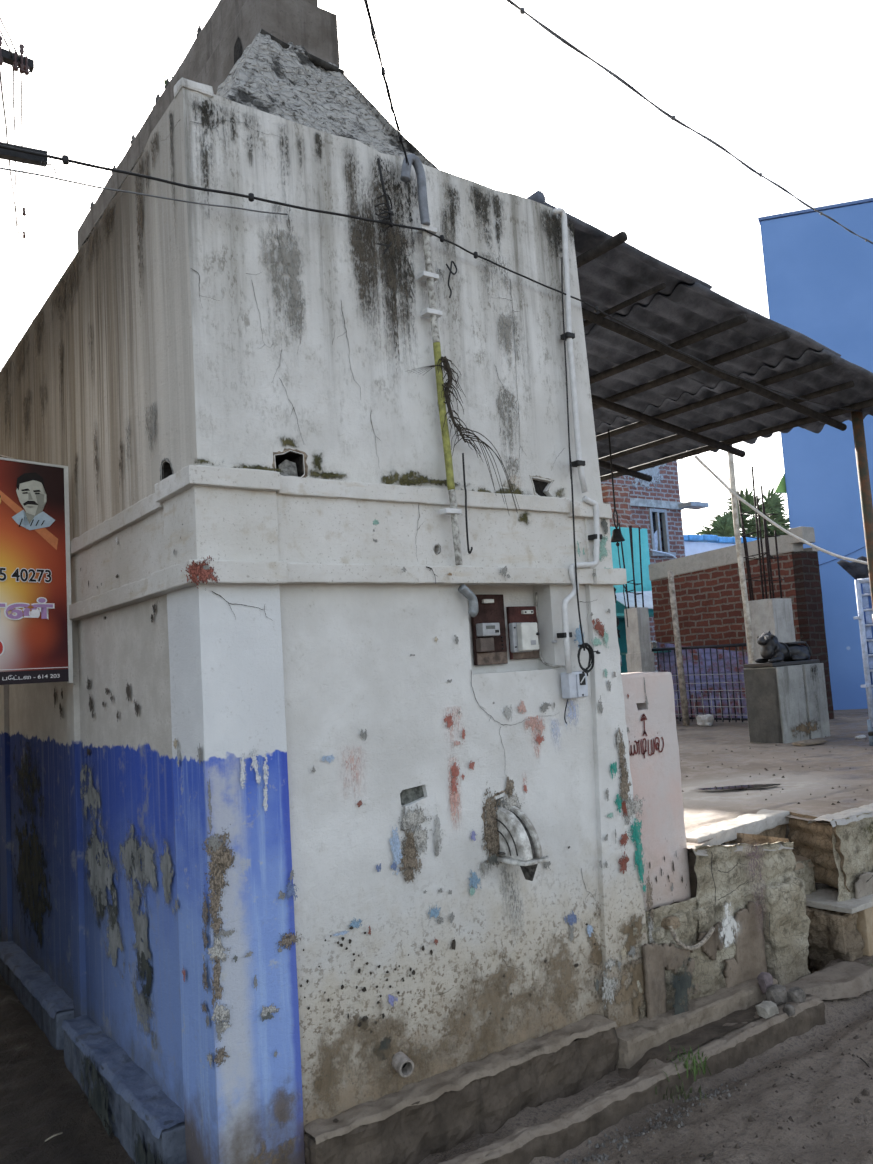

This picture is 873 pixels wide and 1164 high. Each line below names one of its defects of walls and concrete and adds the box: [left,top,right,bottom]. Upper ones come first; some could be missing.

leakage [135,114,175,284]
leakage [345,154,419,372]
leakage [1,207,114,439]
flaking render [181,556,220,591]
leakage [13,742,52,948]
flaking render [376,785,442,884]
peeling [449,761,475,803]
flaking render [471,776,527,870]
flaking render [197,743,253,1069]
flaking render [324,918,415,1033]
leakage [314,1028,347,1110]
leakage [361,1026,433,1093]